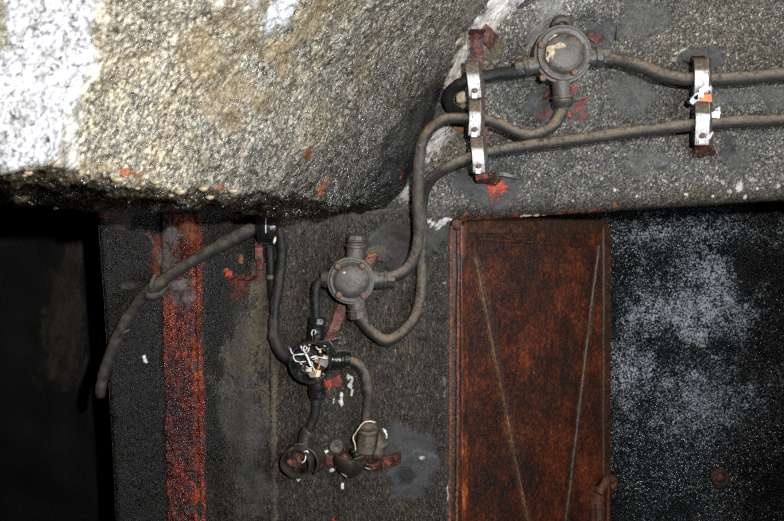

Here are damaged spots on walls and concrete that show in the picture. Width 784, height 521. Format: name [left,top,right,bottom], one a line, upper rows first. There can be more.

rust [157,210,202,250]
water stain [609,207,784,453]